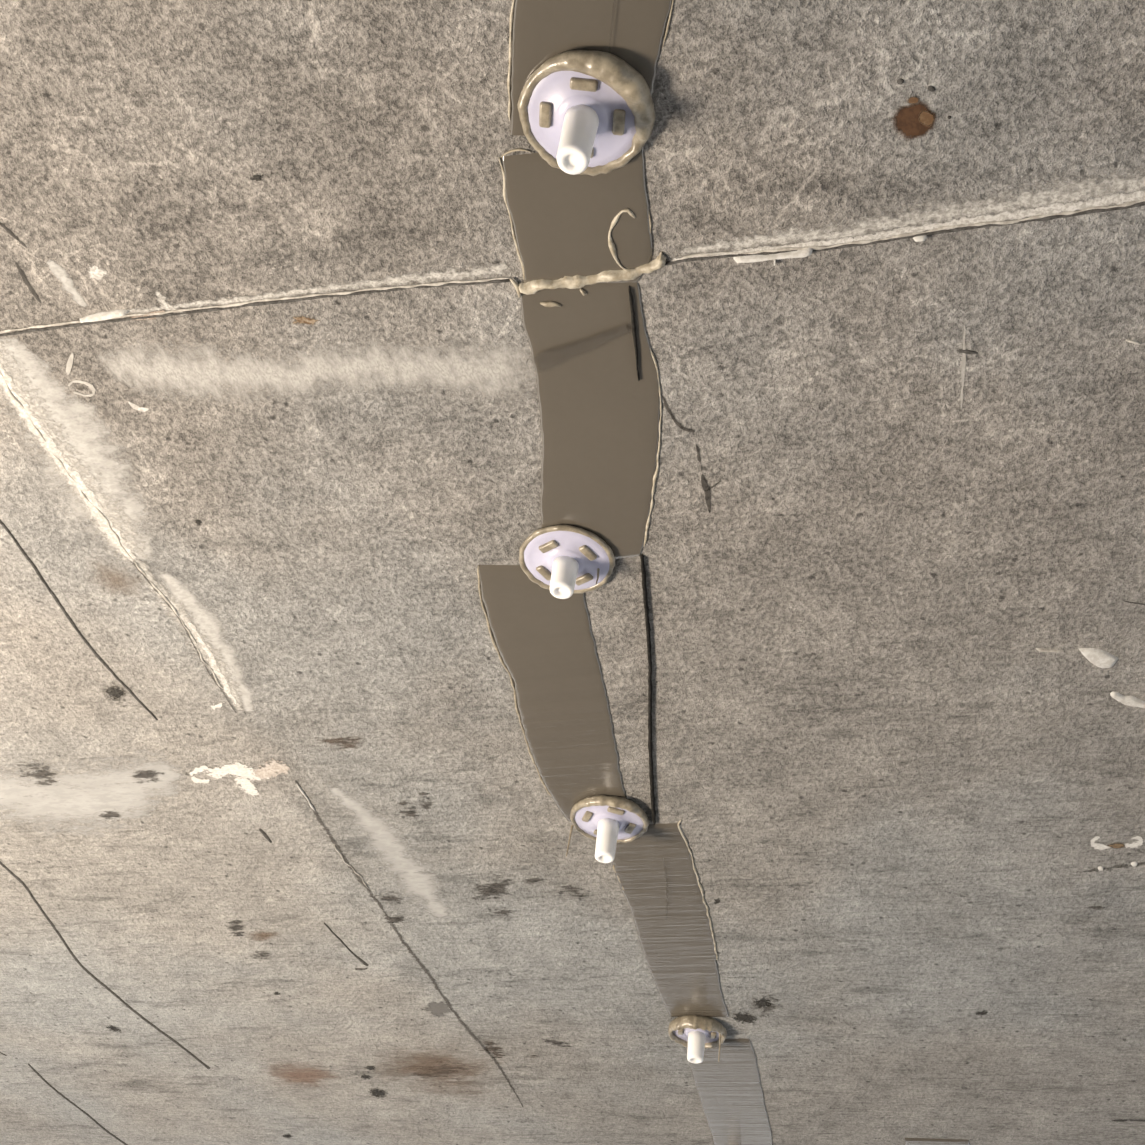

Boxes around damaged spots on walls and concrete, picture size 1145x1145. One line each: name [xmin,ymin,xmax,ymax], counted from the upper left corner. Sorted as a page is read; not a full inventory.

rust [892,86,951,139]
leakage [66,353,96,397]
crack [628,286,639,381]
crack [662,395,720,513]
crack [0,520,158,720]
crack [640,554,656,825]
peeling [190,758,290,797]
crack [259,828,272,843]
crack [0,861,210,1070]
crack [324,923,368,970]
crack [0,1052,128,1145]